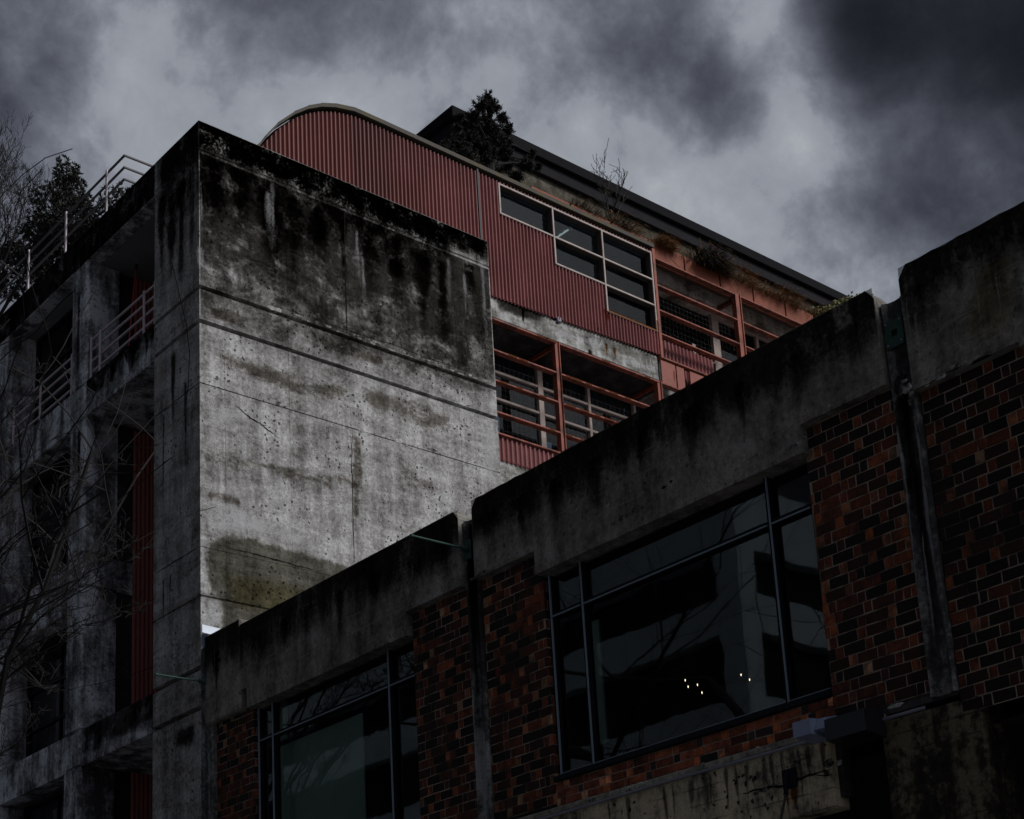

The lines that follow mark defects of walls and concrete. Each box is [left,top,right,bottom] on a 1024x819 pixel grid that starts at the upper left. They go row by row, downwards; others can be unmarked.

leakage [0,121,488,344]